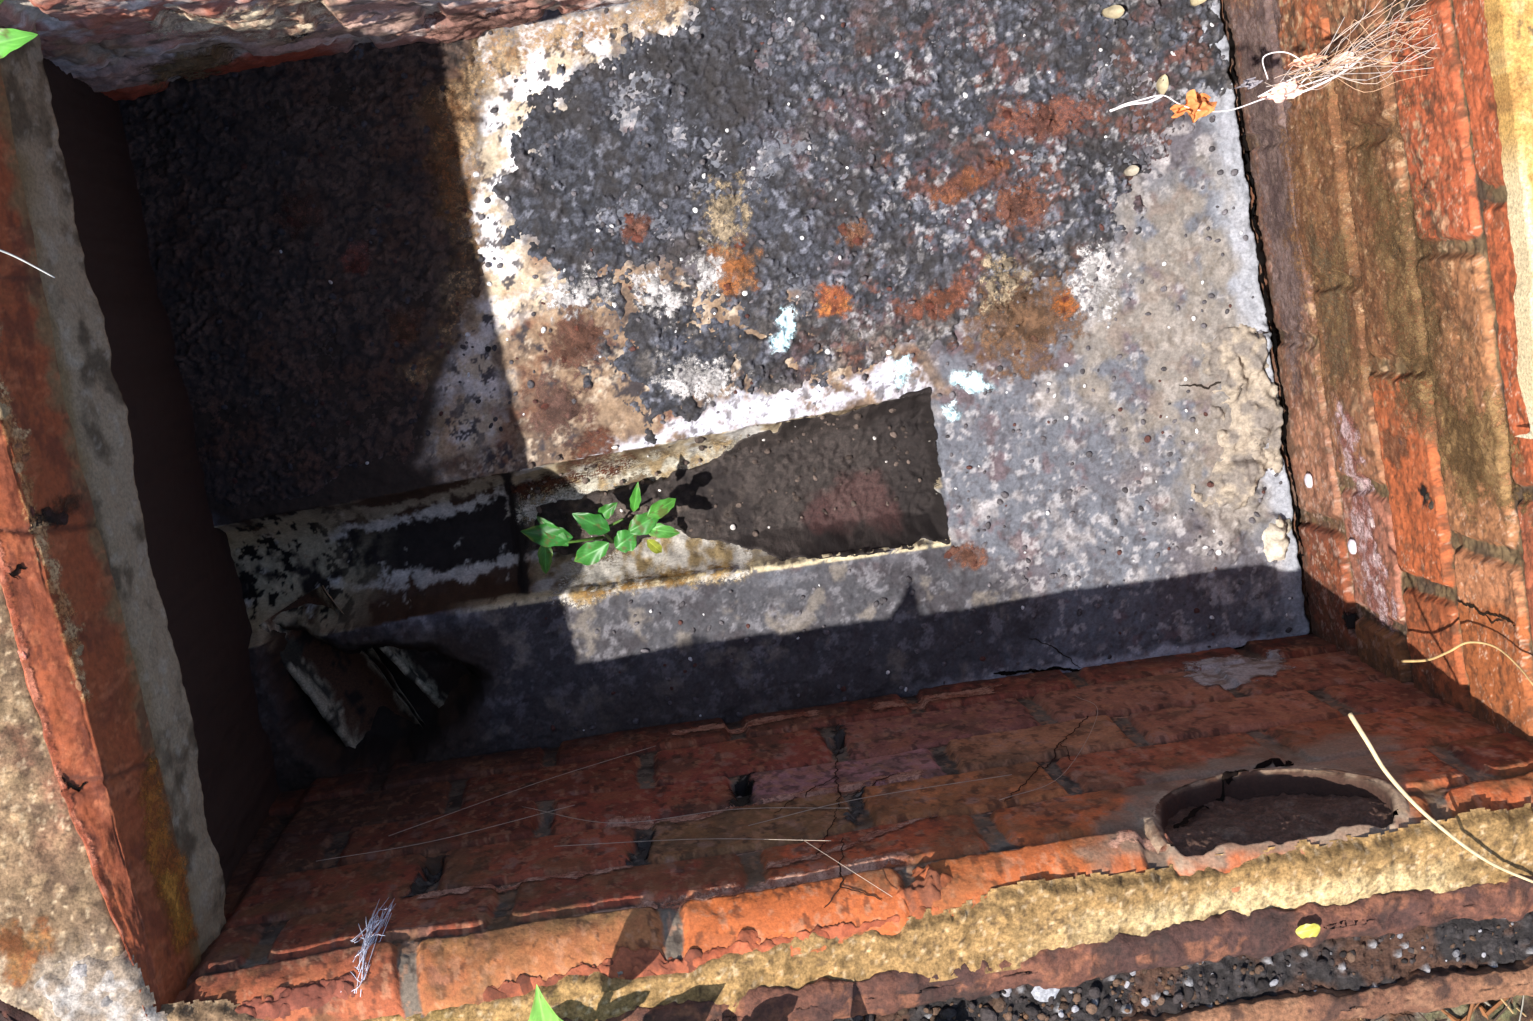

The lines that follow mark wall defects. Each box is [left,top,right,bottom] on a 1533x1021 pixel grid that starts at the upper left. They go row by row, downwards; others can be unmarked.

water stain [404,0,684,383]
rust [620,212,651,243]
rust [706,237,763,297]
rust [815,283,852,318]
rust [837,218,873,247]
rust [895,256,1087,383]
rust [929,90,1109,241]
crack [1457,600,1516,626]
crack [1004,711,1097,803]
crack [775,751,900,908]